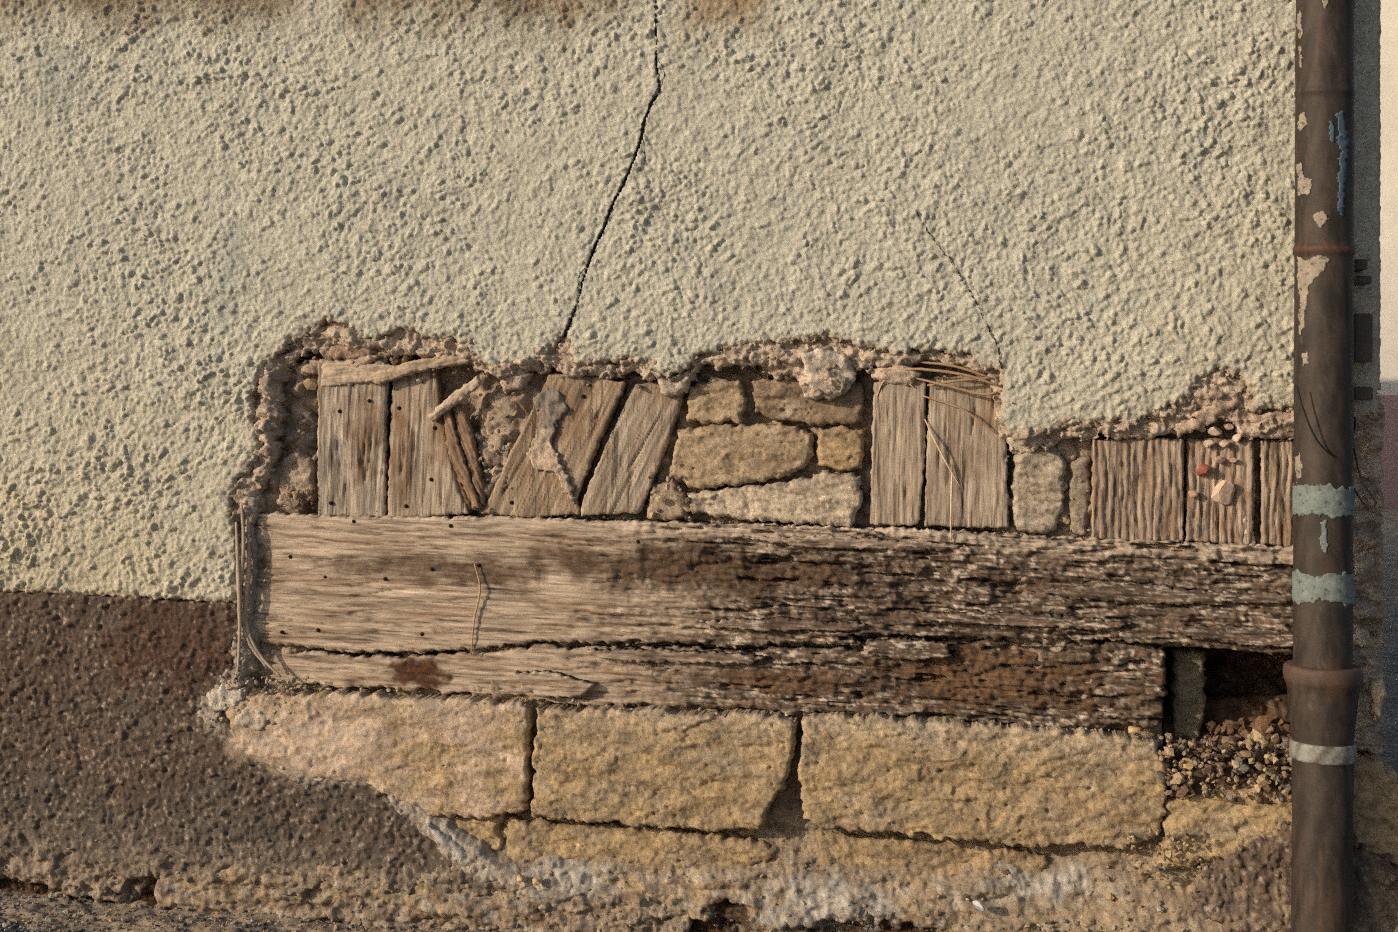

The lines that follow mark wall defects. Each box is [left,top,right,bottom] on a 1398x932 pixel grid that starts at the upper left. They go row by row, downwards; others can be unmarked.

crack [563,0,665,338]
flaking render [197,319,1303,736]
flaking render [1353,403,1385,754]
flaking render [387,794,583,896]
efflorescence [526,858,611,899]
efflorescence [757,874,897,932]